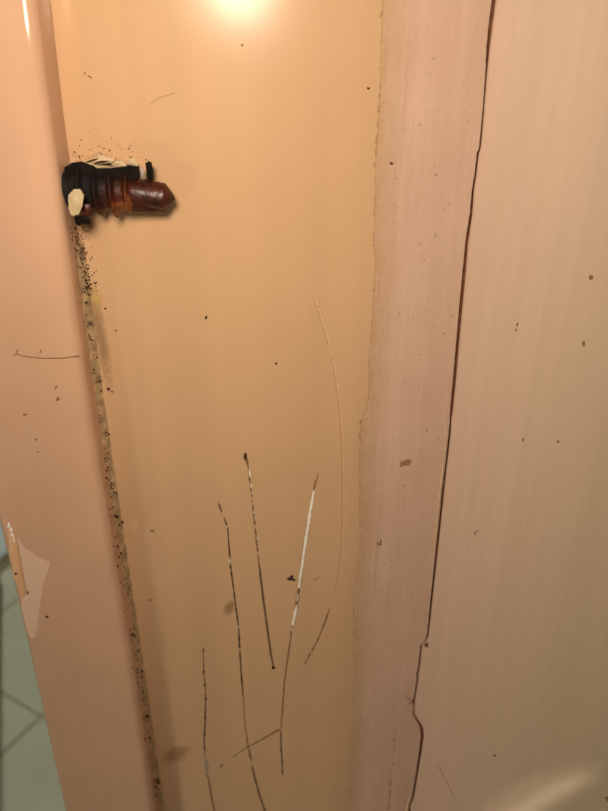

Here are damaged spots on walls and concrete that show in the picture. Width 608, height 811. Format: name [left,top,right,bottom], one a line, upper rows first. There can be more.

peeling [7,522,50,638]
crack [388,0,496,811]